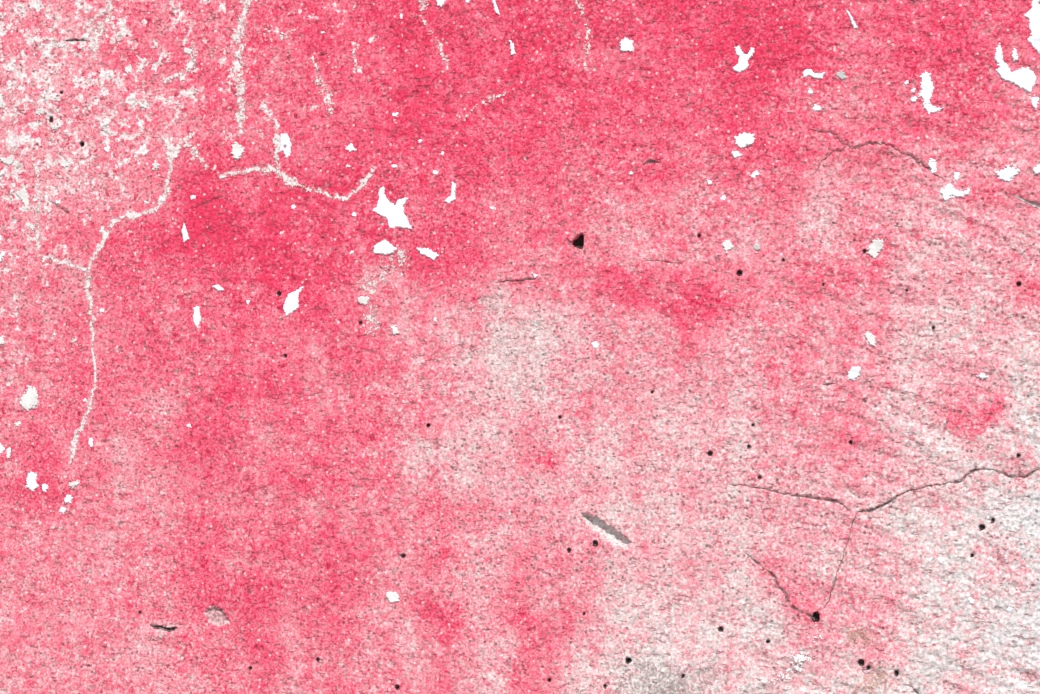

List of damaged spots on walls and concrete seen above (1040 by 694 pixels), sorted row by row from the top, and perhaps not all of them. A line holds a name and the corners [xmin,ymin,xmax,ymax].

peeling [1024,0,1040,54]
peeling [910,70,944,114]
peeling [994,43,1039,110]
crack [808,129,942,178]
peeling [357,187,439,336]
peeling [283,286,304,316]
crack [732,468,1040,620]